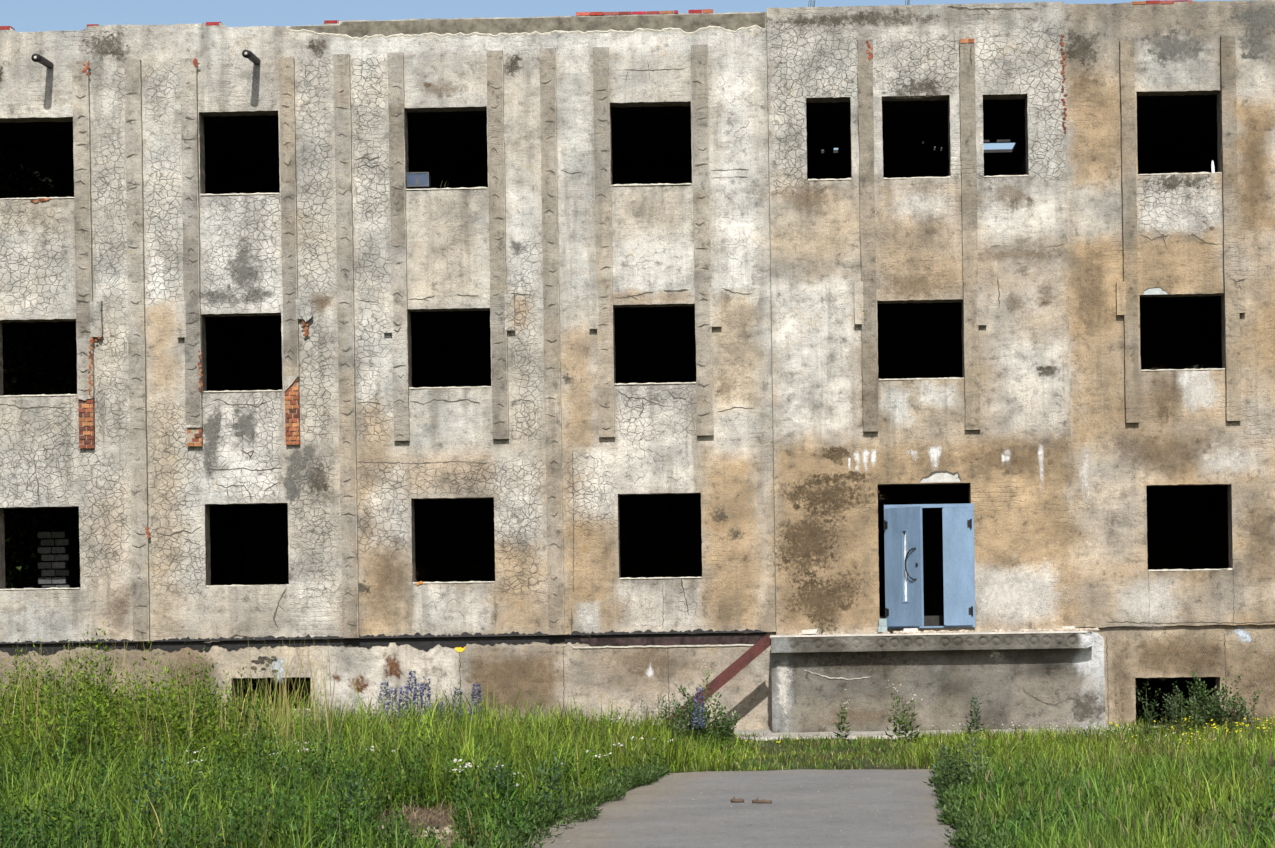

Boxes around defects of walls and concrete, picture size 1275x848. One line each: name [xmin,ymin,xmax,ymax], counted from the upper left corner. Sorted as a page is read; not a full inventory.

damp [1065,30,1098,65]
damp [1146,30,1210,65]
damp [1145,173,1210,191]
crack [0,6,1060,719]
spalling [77,333,103,449]
spalling [284,376,300,445]
damp [848,450,876,469]
damp [1080,448,1089,500]
damp [975,574,1059,613]
damp [1125,583,1172,618]
rust [333,675,368,692]
rust [385,656,401,678]